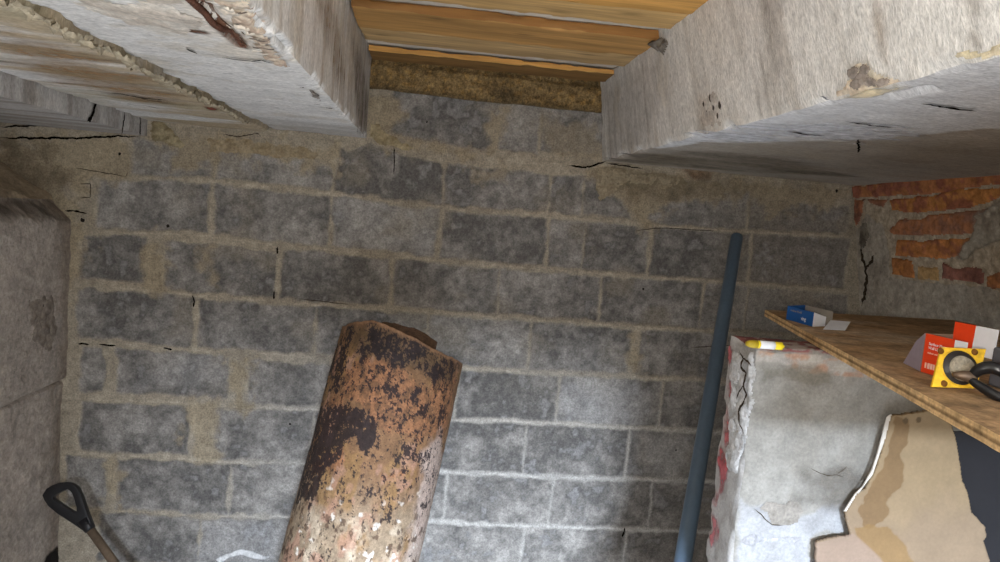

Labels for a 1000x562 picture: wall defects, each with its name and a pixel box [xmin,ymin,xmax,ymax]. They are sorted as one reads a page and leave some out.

rust [188,0,248,49]
spalling [821,63,900,100]
crack [2,93,162,140]
crack [571,161,642,169]
flaking render [852,175,1000,293]
crack [861,251,874,303]
crack [691,345,751,433]
peeling [760,501,803,525]